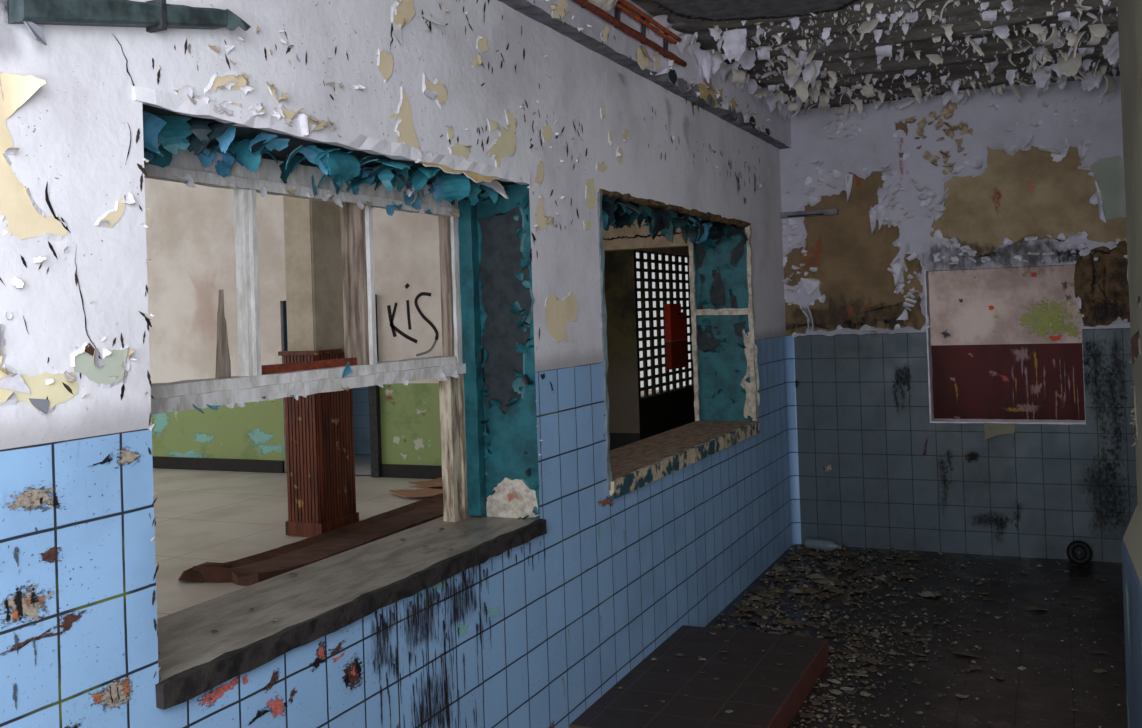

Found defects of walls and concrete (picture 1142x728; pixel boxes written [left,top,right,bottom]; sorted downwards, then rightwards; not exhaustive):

peeling [0,71,69,288]
peeling [94,0,761,519]
peeling [534,0,1141,446]
leakage [1012,303,1130,529]
leakage [373,557,492,728]